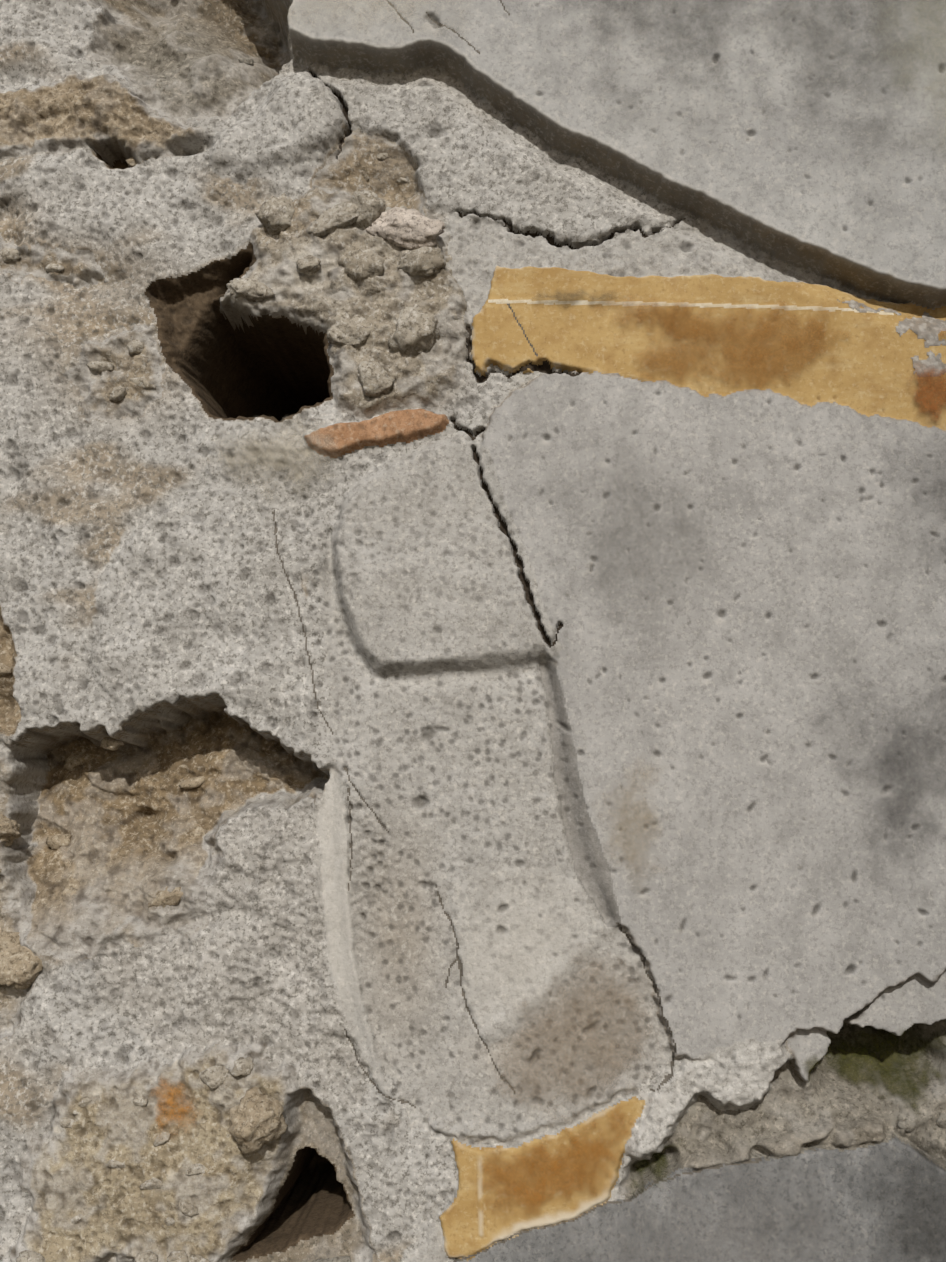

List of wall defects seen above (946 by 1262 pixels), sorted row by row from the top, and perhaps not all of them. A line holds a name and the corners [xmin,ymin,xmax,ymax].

crack [311,70,352,159]
crack [458,211,686,250]
crack [451,419,563,648]
spalling [0,607,330,961]
spalling [0,982,34,1041]
spalling [9,1038,374,1262]
crack [435,884,515,1094]
spalling [619,1019,946,1199]